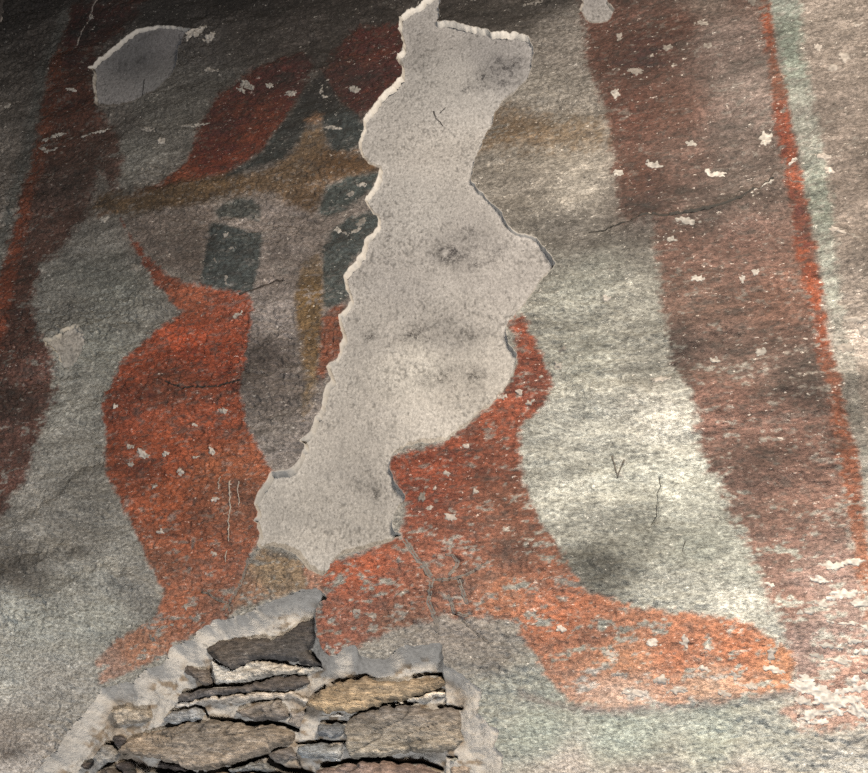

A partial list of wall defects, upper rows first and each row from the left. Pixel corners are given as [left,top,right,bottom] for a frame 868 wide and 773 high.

flaking render [578,0,615,24]
flaking render [88,24,216,108]
peeling [236,80,254,94]
peeling [38,132,66,154]
peeling [758,131,773,146]
crack [589,177,774,233]
peeling [675,216,702,225]
flaking render [253,0,557,577]
peeling [43,323,87,371]
peeling [126,444,150,467]
flaking render [34,588,503,773]